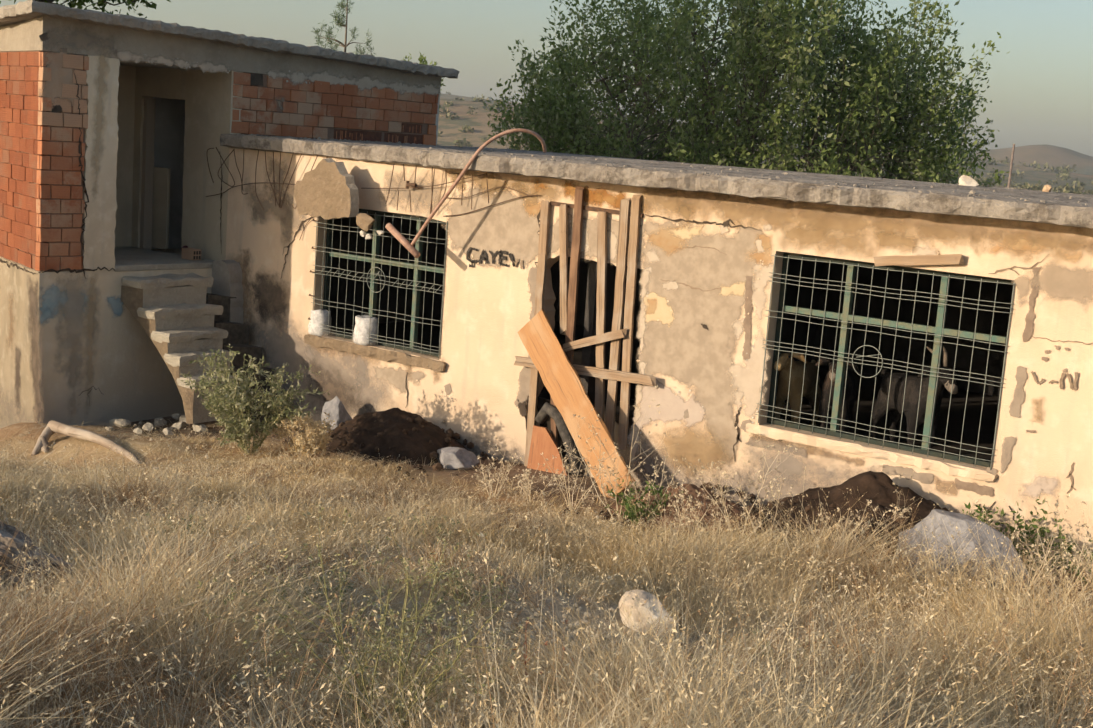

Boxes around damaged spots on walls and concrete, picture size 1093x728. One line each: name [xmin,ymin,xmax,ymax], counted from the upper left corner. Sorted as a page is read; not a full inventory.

crack [0,69,115,279]
leakage [1,279,123,423]
crack [281,217,313,278]
leakage [237,260,386,414]
flaking render [206,147,863,465]
crack [645,214,758,255]
leakage [643,187,1093,304]
spalling [935,478,956,495]